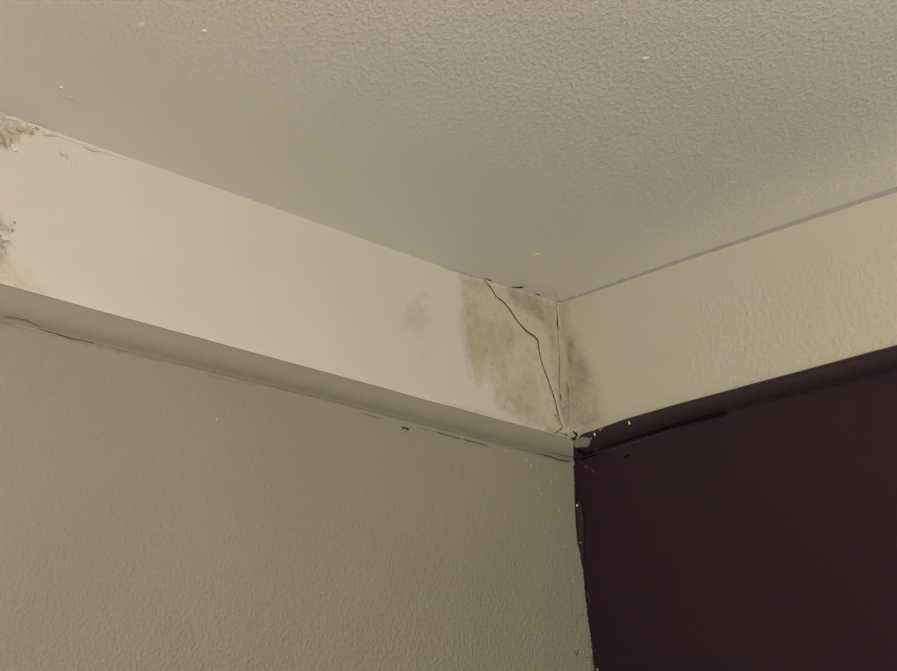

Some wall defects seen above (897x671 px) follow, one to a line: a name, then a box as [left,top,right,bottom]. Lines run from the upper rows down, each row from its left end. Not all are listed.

crack [444,267,575,461]